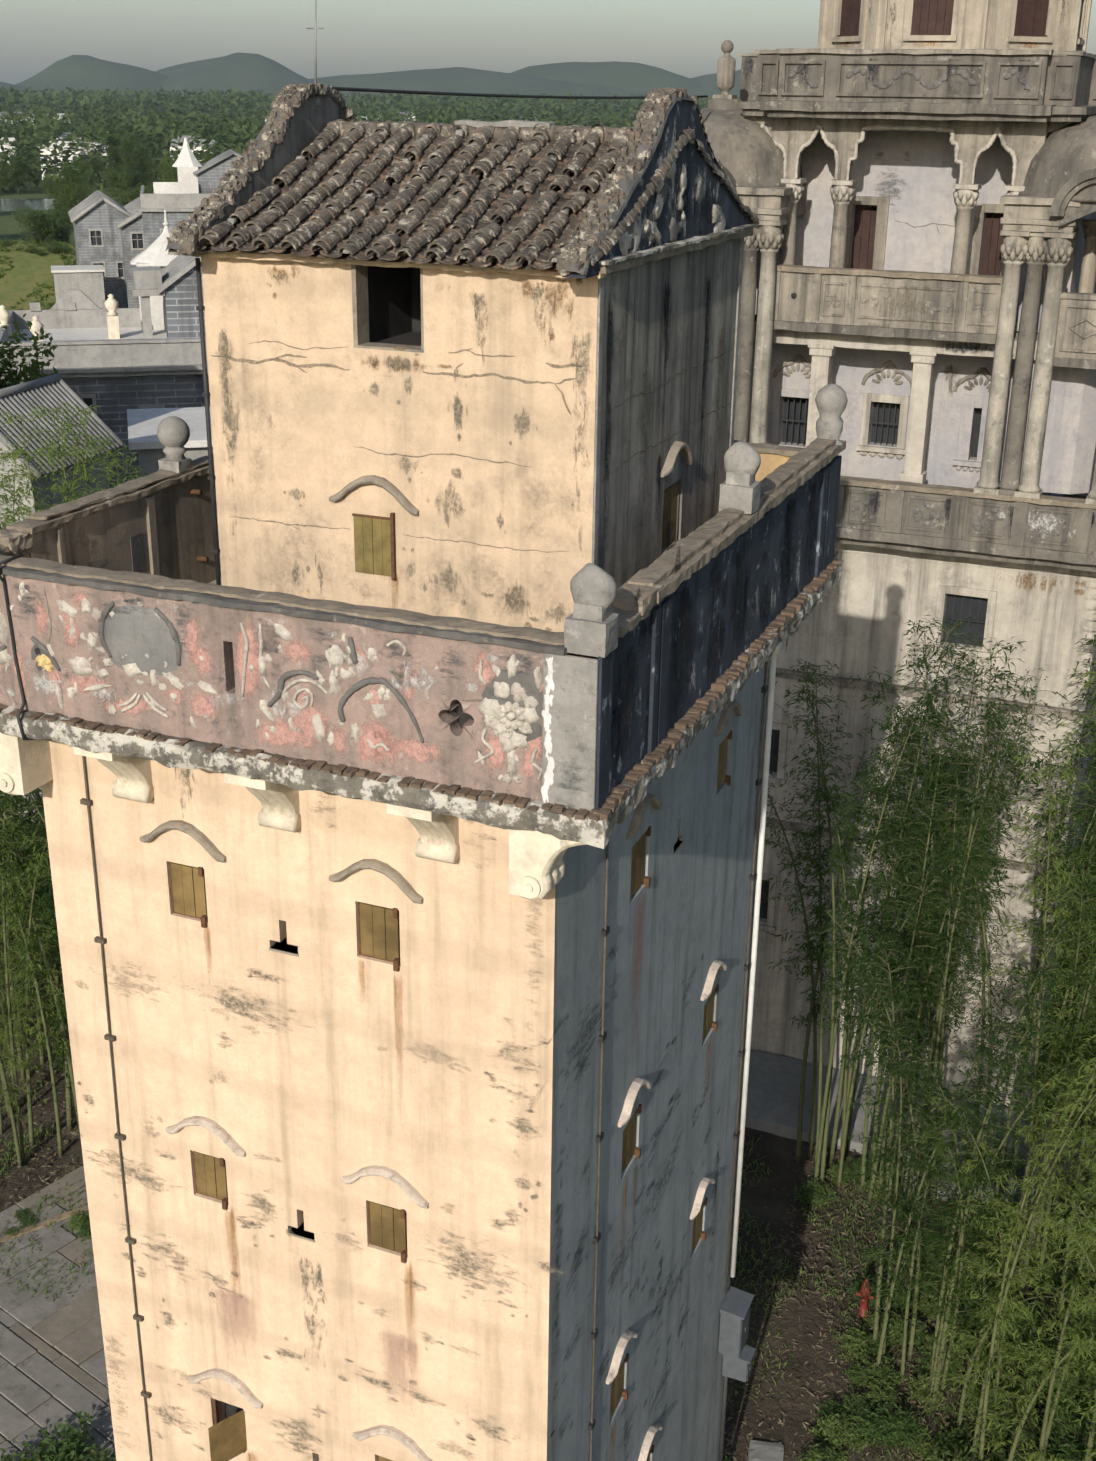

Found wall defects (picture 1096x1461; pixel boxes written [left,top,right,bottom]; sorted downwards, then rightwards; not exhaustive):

damp [218,332,239,448]
crack [211,340,349,373]
peeling [5,589,440,763]
flaking render [478,657,554,803]
damp [217,988,275,1026]